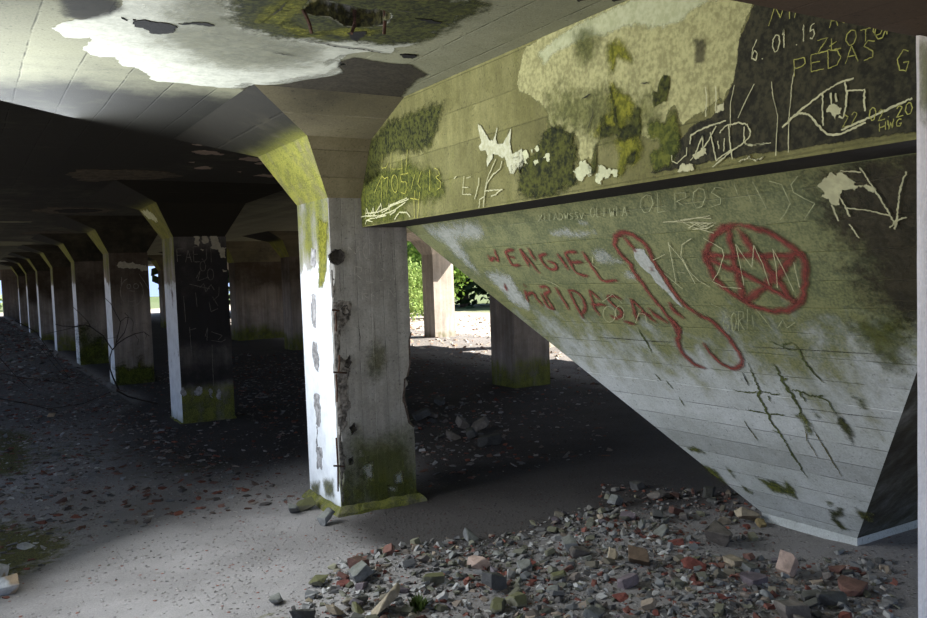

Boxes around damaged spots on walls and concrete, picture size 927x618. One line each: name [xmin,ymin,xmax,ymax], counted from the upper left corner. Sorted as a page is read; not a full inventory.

peeling [52,0,417,88]
leakage [577,32,593,58]
leakage [591,83,642,176]
leakage [606,39,632,71]
peeling [517,0,753,185]
crack [601,329,667,351]
spalling [287,249,357,526]
crack [735,341,887,478]